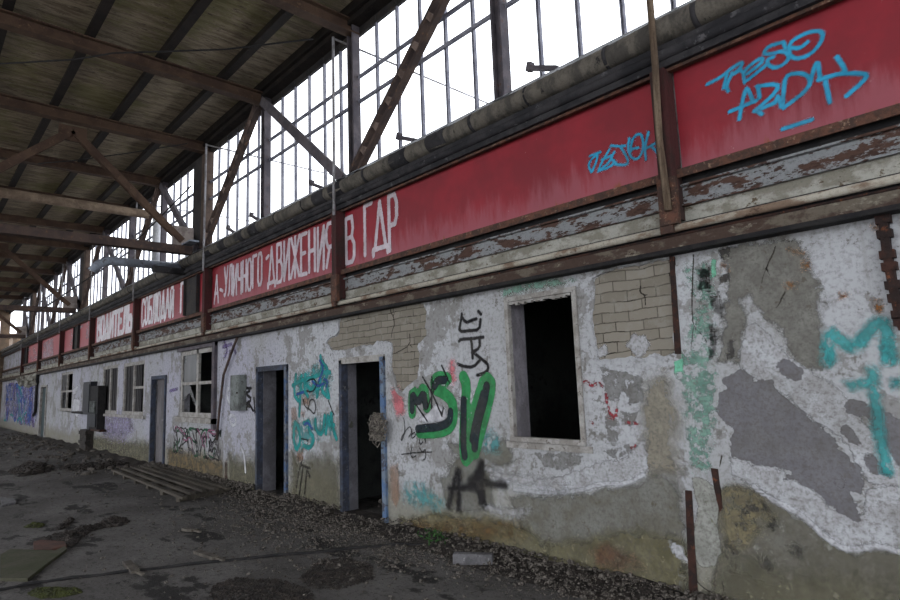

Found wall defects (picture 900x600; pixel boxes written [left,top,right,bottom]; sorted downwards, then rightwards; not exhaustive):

spalling [324,303,433,399]
peeling [584,239,900,567]
damp [399,376,689,595]
peeling [535,451,583,471]
rust [685,490,698,598]
rust [711,468,723,512]
damp [711,484,900,600]